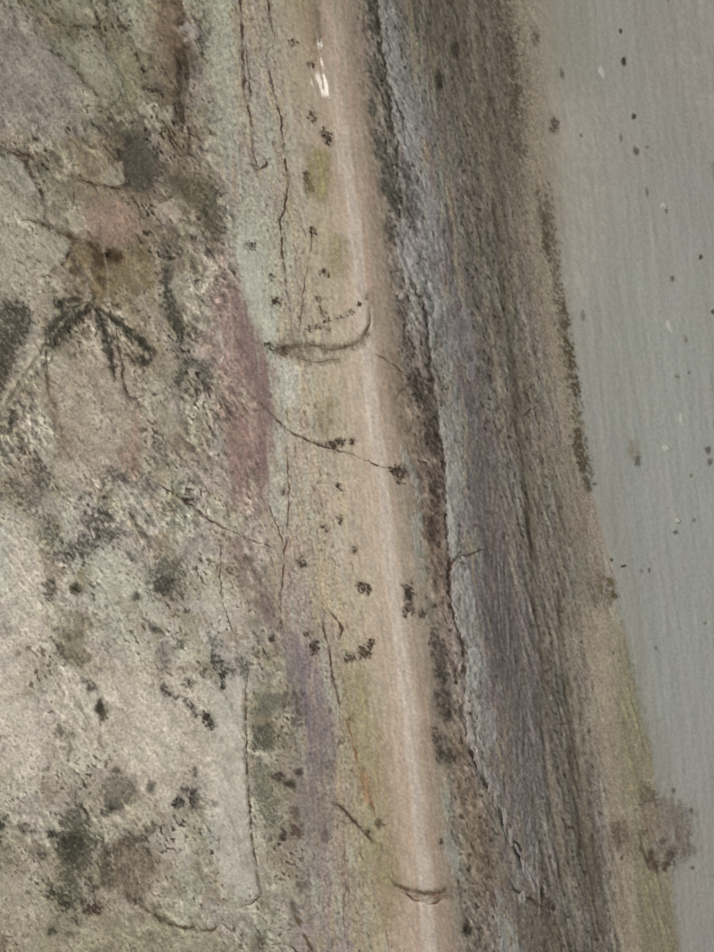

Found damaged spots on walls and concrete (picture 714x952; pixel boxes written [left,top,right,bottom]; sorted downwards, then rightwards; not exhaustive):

crack [239,0,305,294]
crack [377,6,405,157]
crack [288,315,370,363]
crack [235,394,344,452]
crack [162,486,231,627]
crack [250,461,290,590]